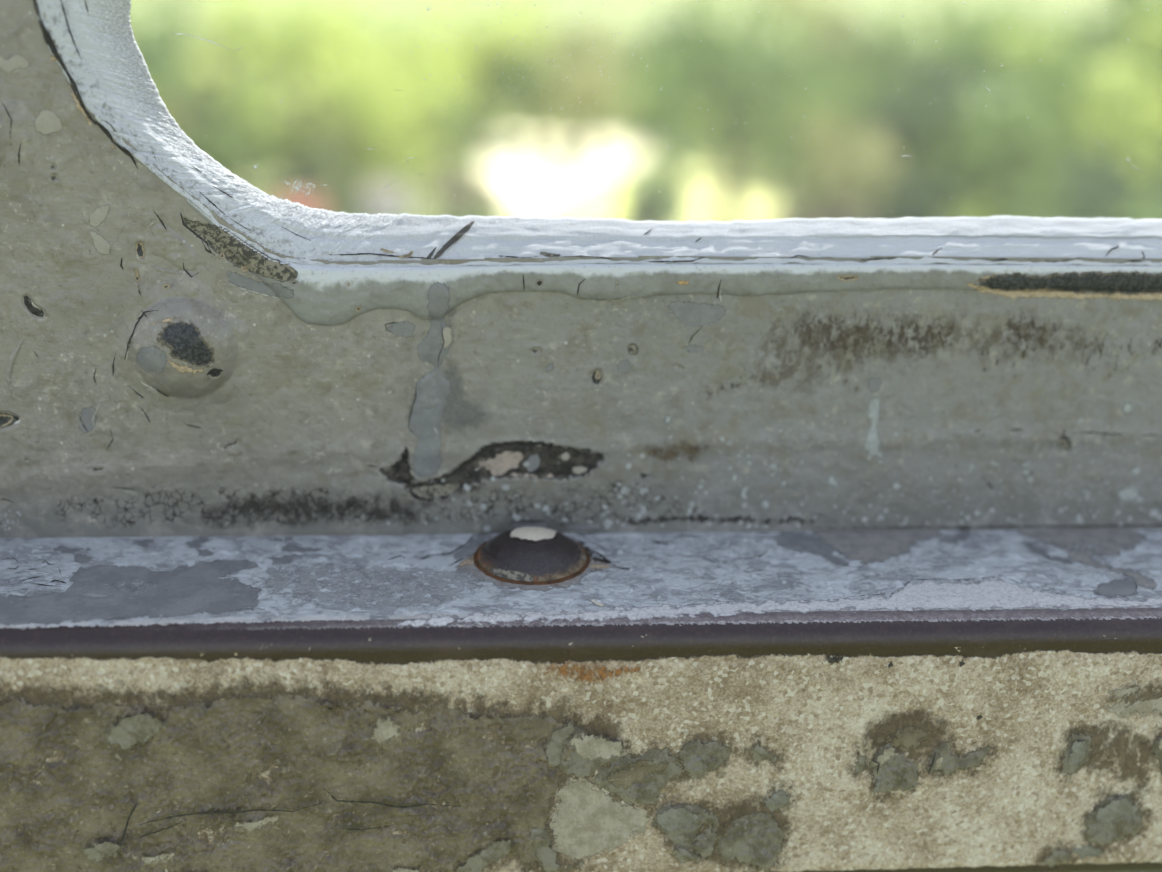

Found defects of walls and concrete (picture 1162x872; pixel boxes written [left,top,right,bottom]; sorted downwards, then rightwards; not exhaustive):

peeling [966,270,1162,301]
peeling [135,316,223,379]
spalling [379,440,605,502]
corrosion [455,535,611,592]
peeling [0,527,1162,629]
peeling [0,677,795,872]
peeling [850,710,997,800]
peeling [1054,728,1096,776]
peeling [1146,728,1162,773]
peeling [1036,788,1151,871]